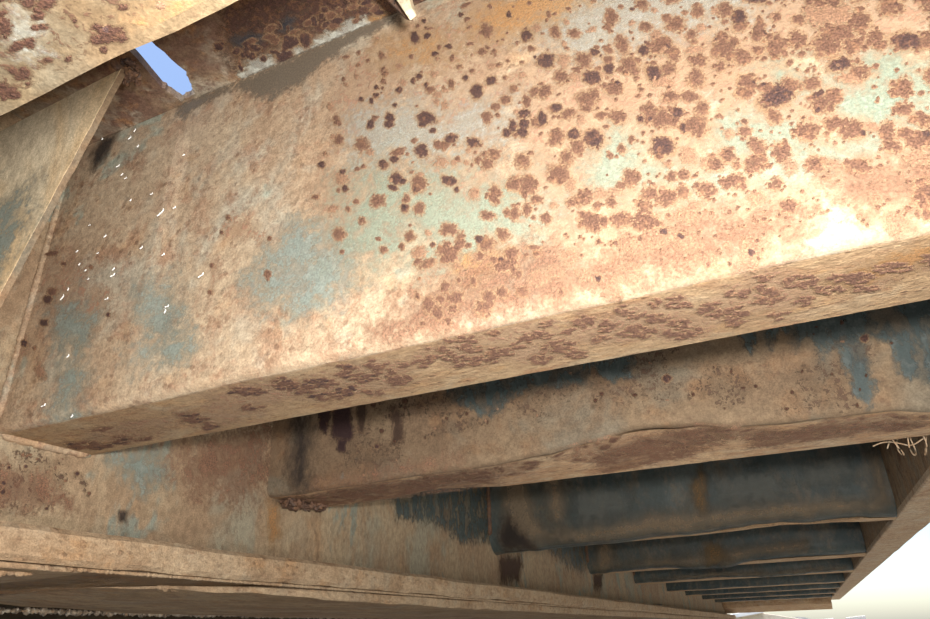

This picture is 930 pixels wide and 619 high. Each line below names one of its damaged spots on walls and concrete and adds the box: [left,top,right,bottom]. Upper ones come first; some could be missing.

rust [0,0,143,101]
rust [38,247,114,333]
rust [64,0,930,514]
rust [18,334,48,380]
rust [0,449,91,516]